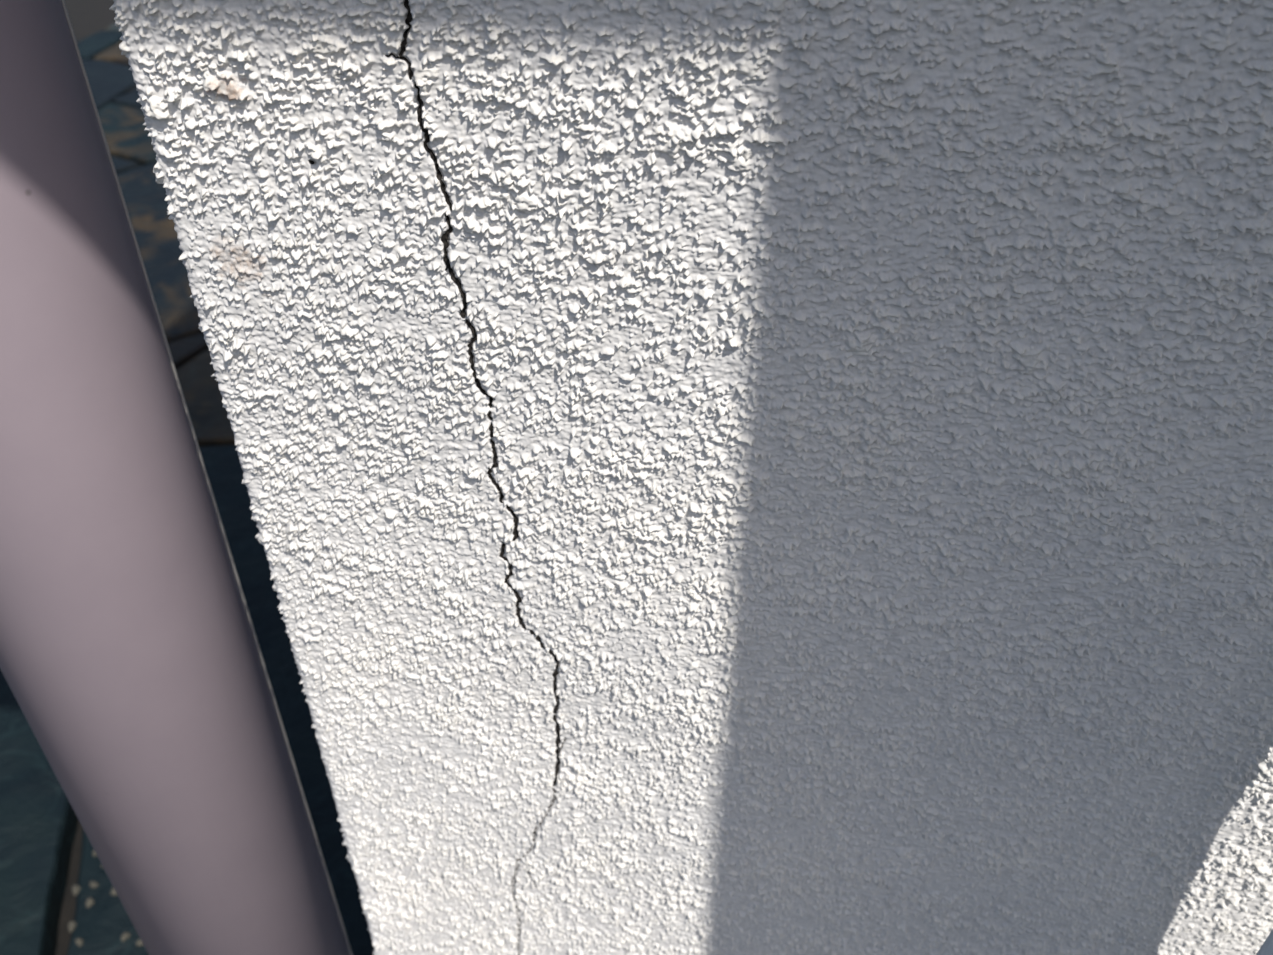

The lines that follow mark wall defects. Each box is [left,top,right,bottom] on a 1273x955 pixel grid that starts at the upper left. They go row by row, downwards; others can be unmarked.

crack [385,0,566,955]